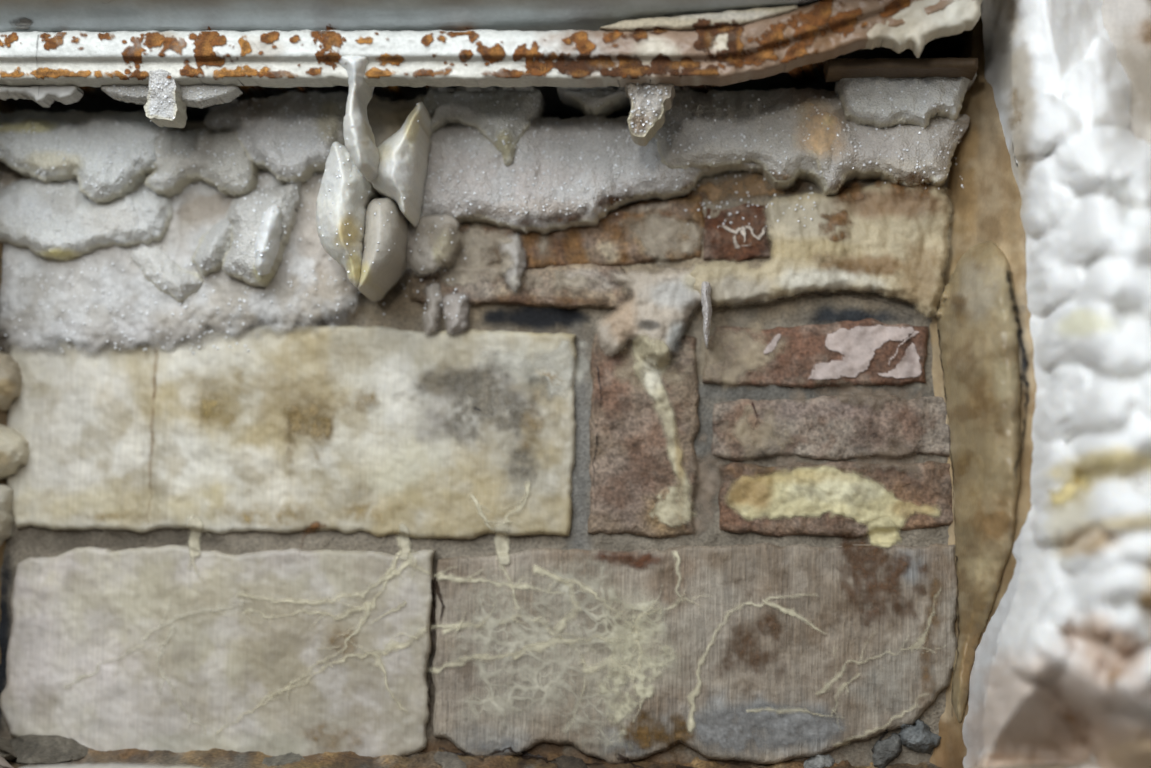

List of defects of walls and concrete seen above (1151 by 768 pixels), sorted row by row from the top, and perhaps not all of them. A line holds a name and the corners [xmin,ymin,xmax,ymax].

corrosion [879,0,911,17]
corrosion [0,0,868,100]
efflorescence [427,212,513,285]
water stain [599,196,698,264]
water stain [722,225,771,248]
water stain [819,174,931,241]
peeling [808,324,921,379]
crack [1007,272,1029,438]
crack [428,578,445,721]
spalling [0,734,88,764]
crack [439,747,556,762]
spalling [872,719,941,768]